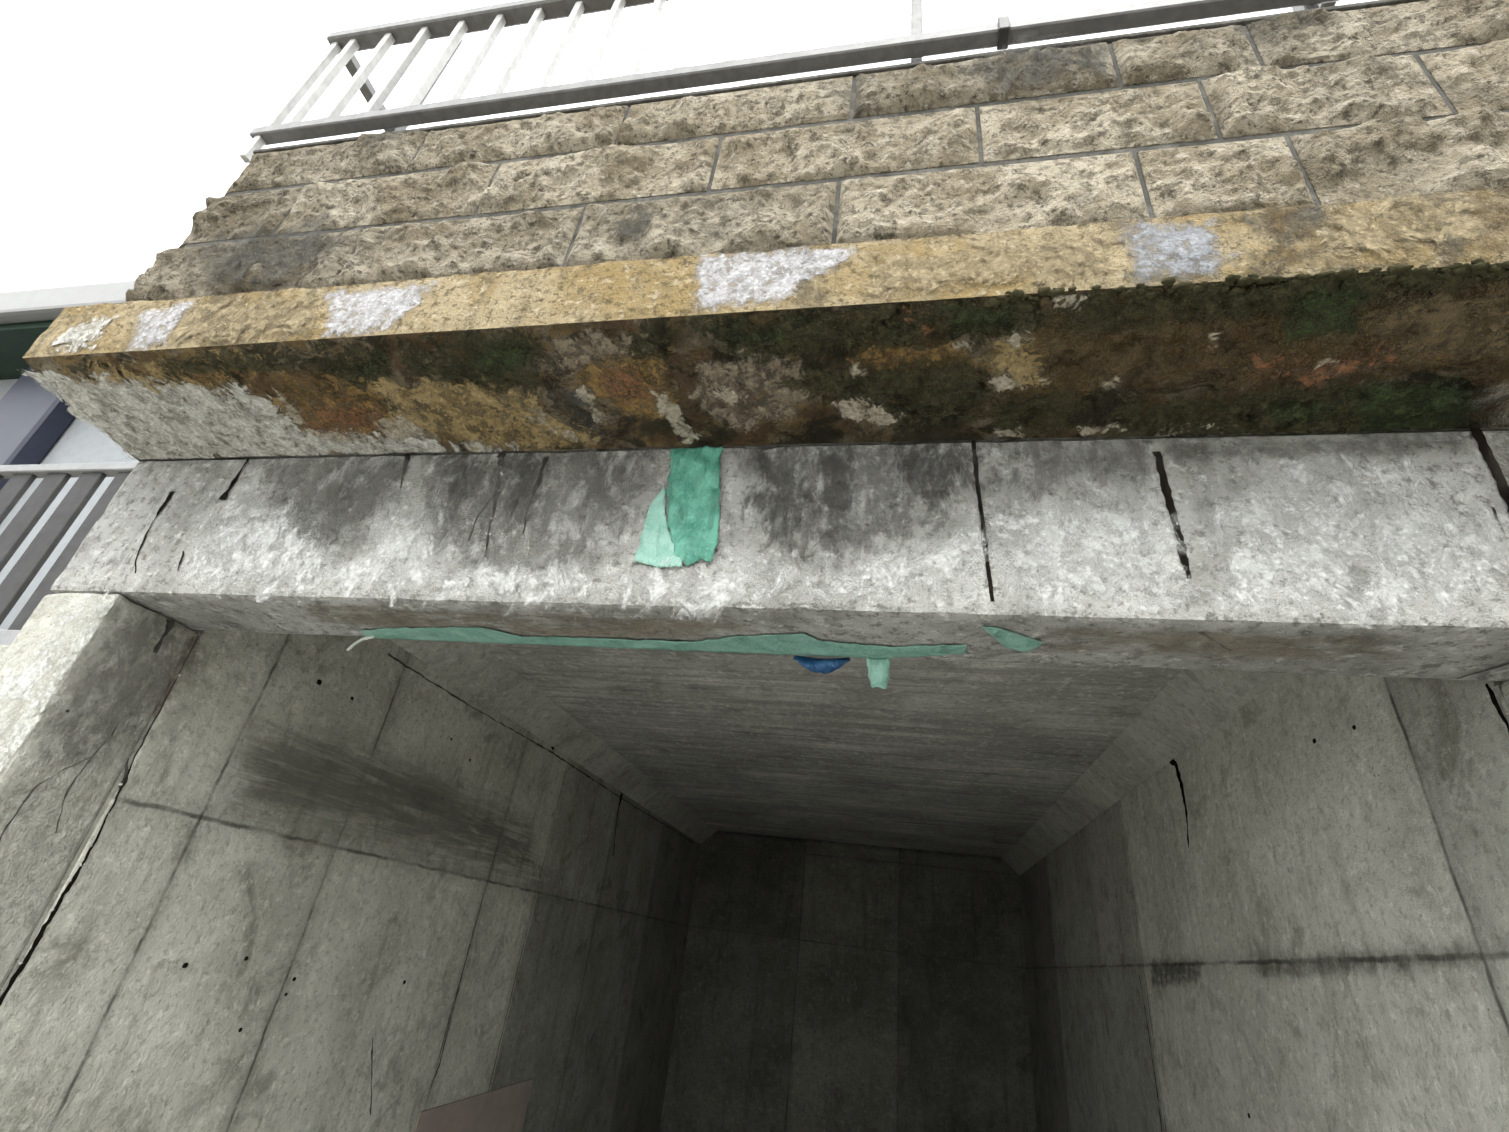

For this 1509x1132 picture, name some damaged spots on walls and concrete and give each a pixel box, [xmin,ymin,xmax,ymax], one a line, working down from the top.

peeling [18,369,519,460]
peeling [491,327,635,443]
damp [192,448,651,604]
damp [621,442,983,609]
crack [971,440,994,601]
crack [1152,451,1192,579]
crack [1471,428,1509,532]
crack [1456,663,1509,733]
crack [0,619,203,1006]
damp [259,741,531,863]